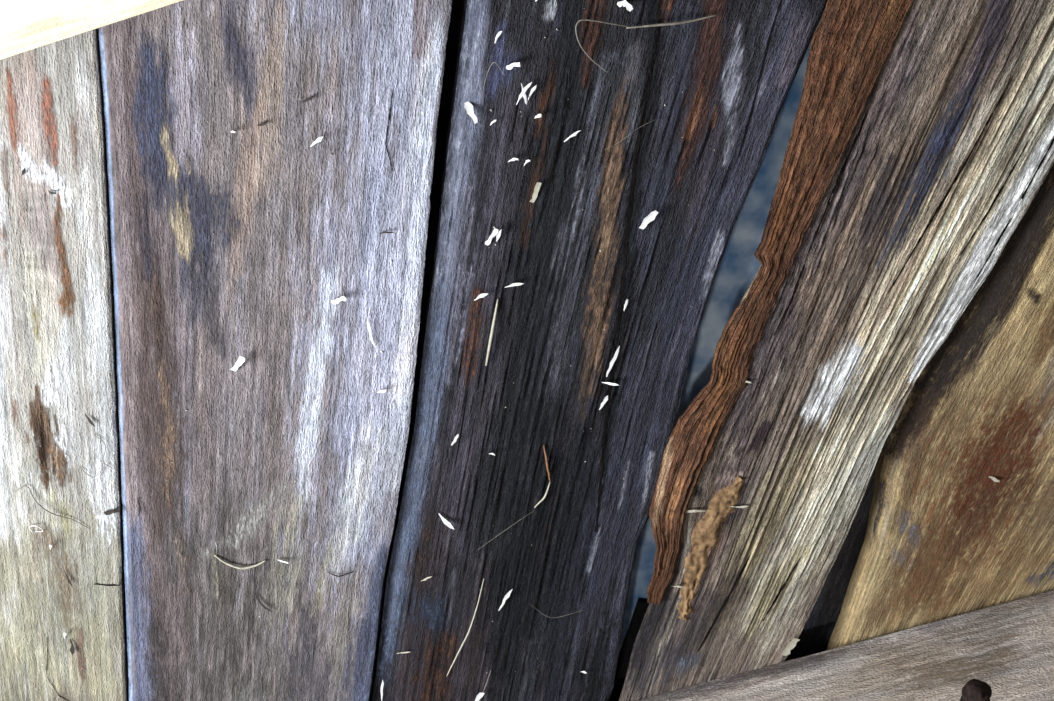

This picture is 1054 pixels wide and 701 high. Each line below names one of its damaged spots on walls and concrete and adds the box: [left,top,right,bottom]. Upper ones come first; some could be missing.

corrosion [2,69,17,190]
corrosion [41,77,58,166]
corrosion [53,193,74,318]
crack [773,109,868,336]
crack [888,81,1011,293]
corrosion [870,383,1054,628]